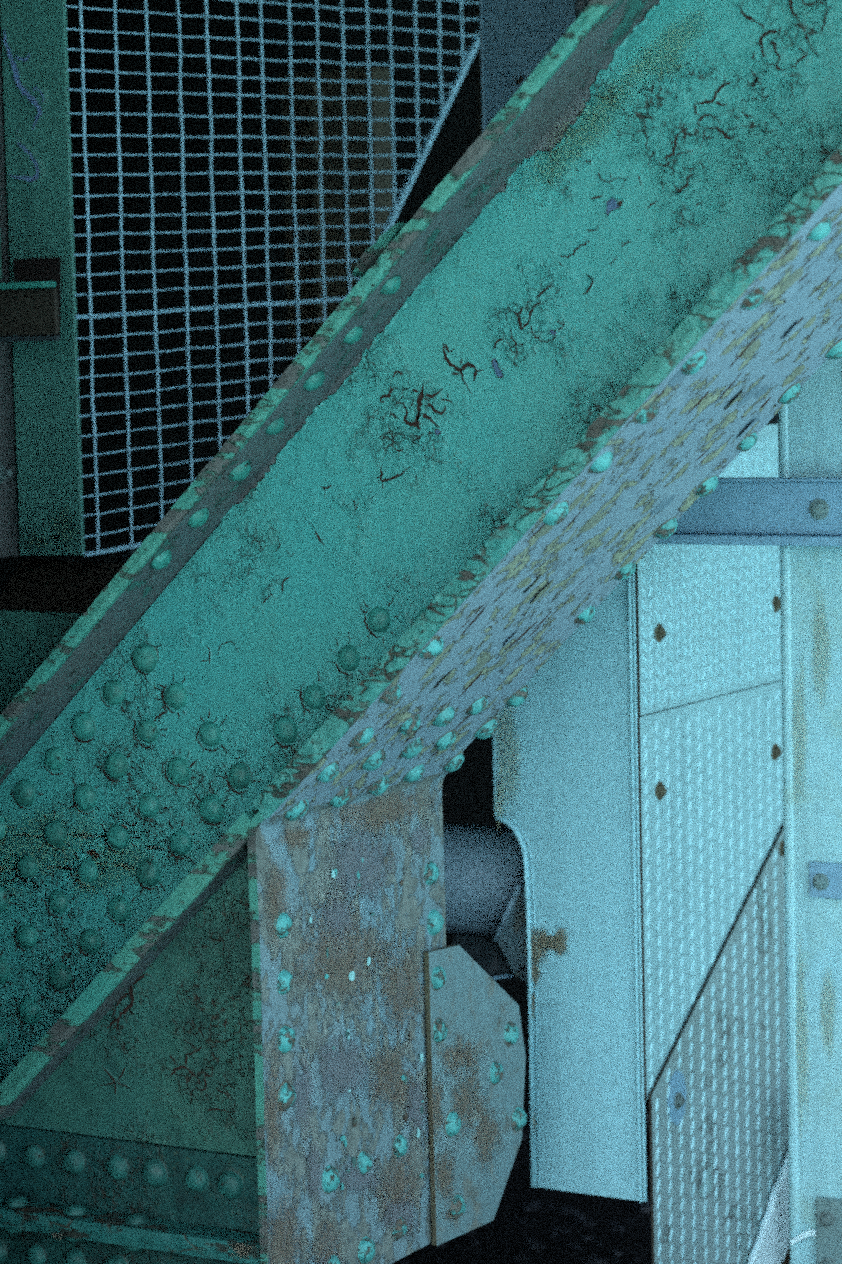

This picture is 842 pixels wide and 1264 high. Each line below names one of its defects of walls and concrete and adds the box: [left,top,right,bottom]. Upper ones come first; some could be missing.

peeling [484,0,662,207]
peeling [604,195,626,218]
crack [262,0,833,604]
peeling [770,235,840,310]
peeling [489,355,508,380]
peeling [632,333,771,494]
peeling [527,469,608,554]
peeling [378,566,568,774]
spalling [102,972,153,1033]
rust [300,910,373,989]
rust [526,929,567,1017]
rust [431,1039,497,1161]